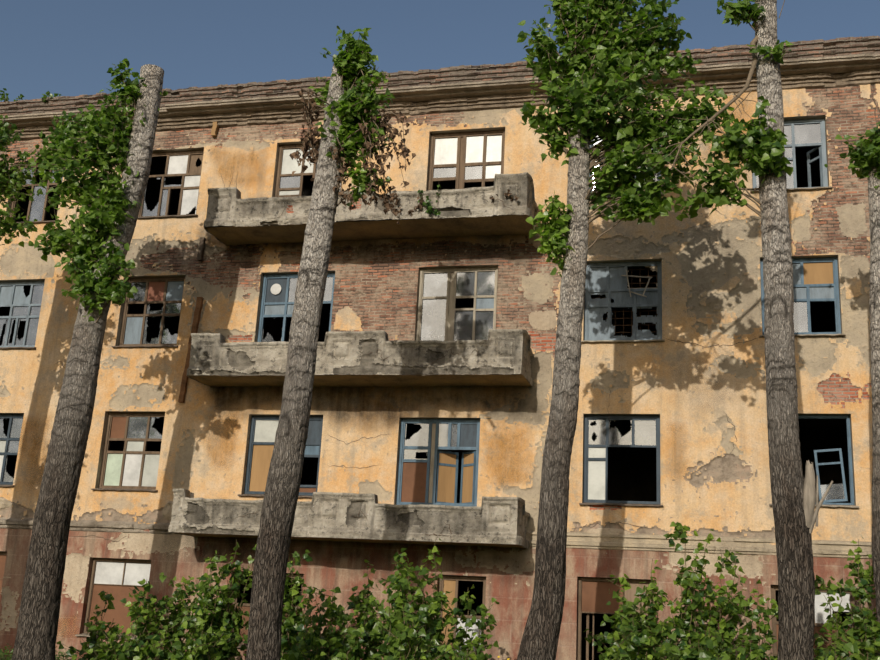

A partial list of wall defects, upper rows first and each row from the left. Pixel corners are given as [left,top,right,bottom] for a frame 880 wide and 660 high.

flaking render [125,230,302,376]
peeling [587,211,762,344]
flaking render [791,84,880,408]
peeling [100,355,174,411]
flaking render [328,235,562,586]
peeling [586,358,635,403]
peeling [708,351,765,389]
spalling [672,414,757,498]
spalling [0,493,35,520]